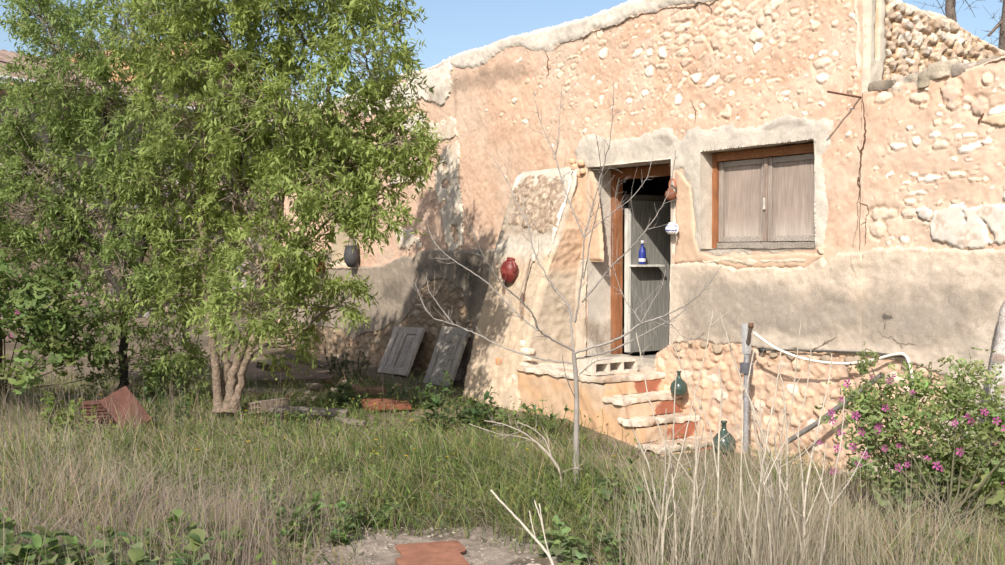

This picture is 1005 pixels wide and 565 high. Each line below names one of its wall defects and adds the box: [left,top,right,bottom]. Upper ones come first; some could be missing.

crack [545,0,718,77]
peeling [361,62,464,252]
flaking render [508,159,586,261]
crack [850,93,869,272]
peeling [916,192,1005,250]
flaking render [249,279,473,382]